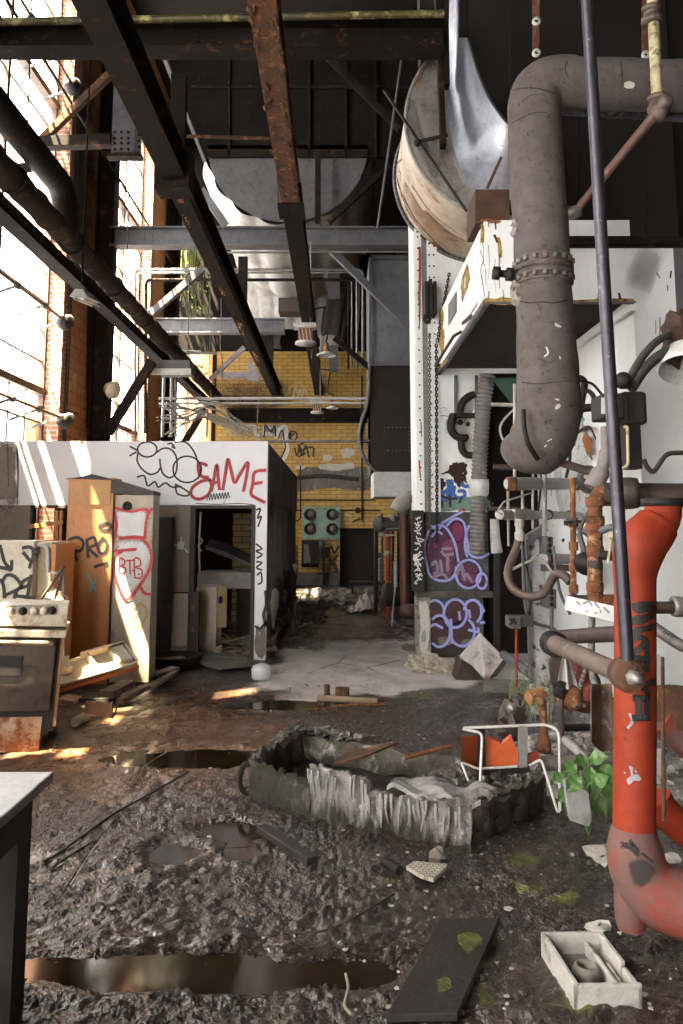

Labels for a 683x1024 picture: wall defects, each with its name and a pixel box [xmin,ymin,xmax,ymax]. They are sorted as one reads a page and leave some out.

rust [245,4,300,201]